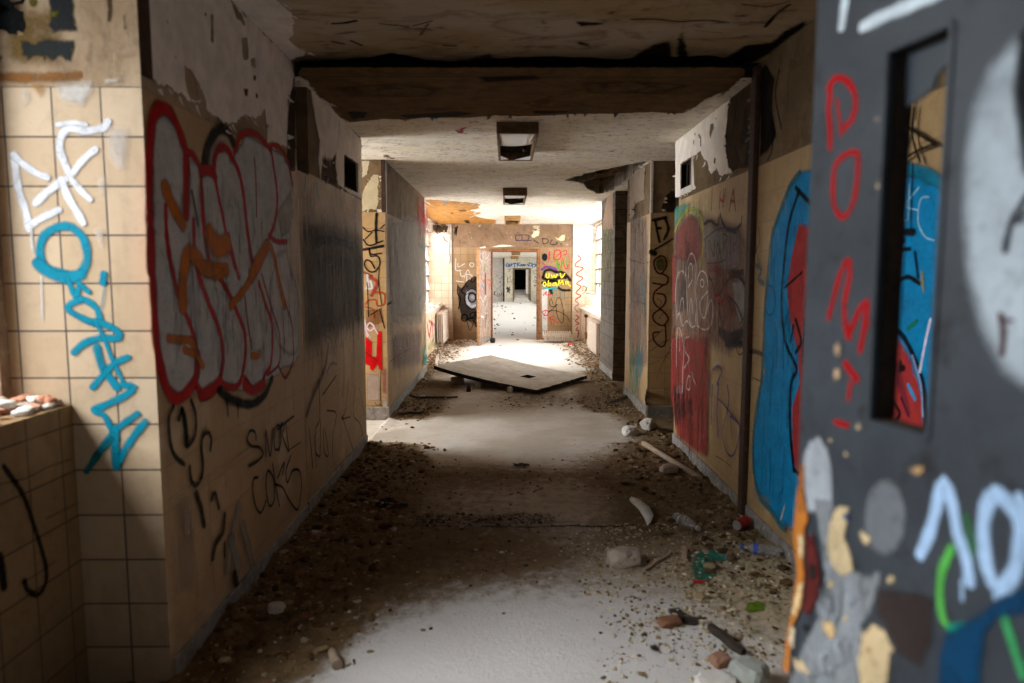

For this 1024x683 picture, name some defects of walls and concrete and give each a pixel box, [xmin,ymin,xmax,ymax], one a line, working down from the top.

flaking render [149,0,751,223]
flaking render [425,200,496,242]